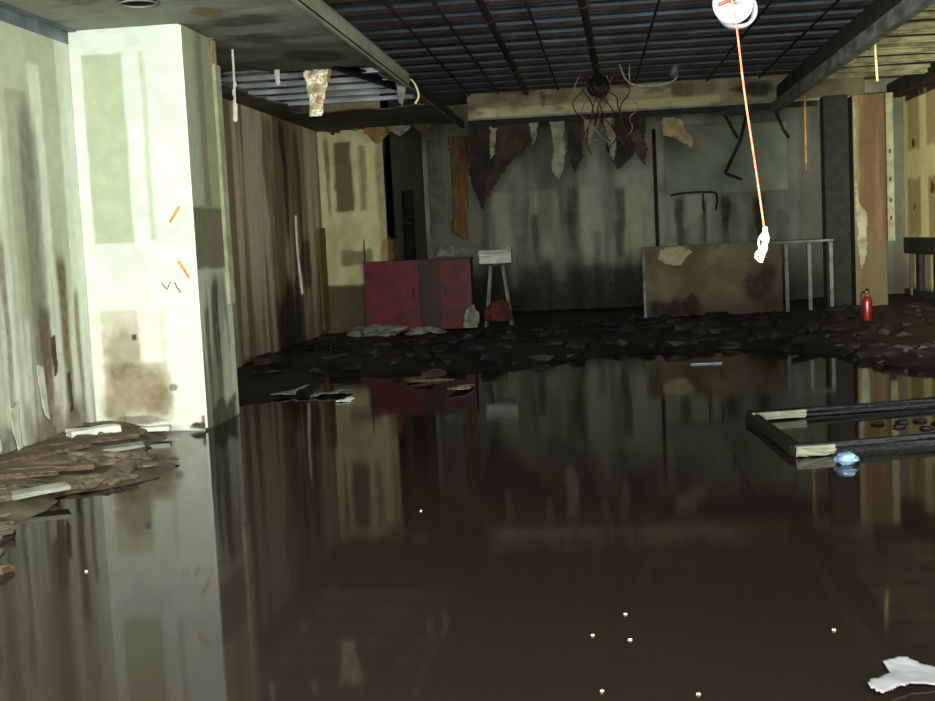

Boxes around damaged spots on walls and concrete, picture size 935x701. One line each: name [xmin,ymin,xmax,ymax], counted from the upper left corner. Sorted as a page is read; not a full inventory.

leakage [905,82,935,101]
leakage [473,269,643,312]
leakage [24,262,81,407]